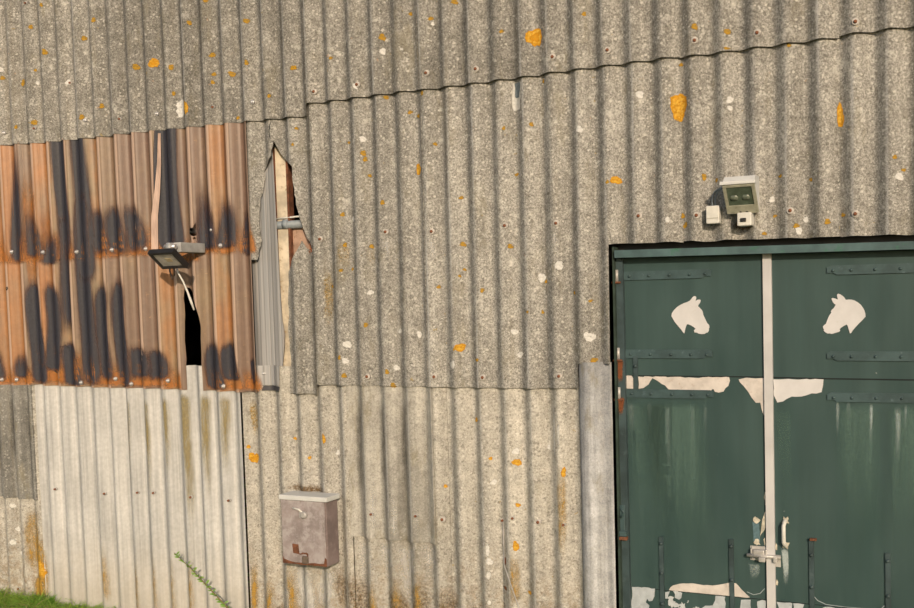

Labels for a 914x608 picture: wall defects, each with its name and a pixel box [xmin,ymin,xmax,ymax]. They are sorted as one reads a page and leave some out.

peeling [626,375,824,415]
leakage [9,517,47,598]
leakage [252,574,278,608]
leakage [288,571,375,608]
peeling [631,583,766,608]